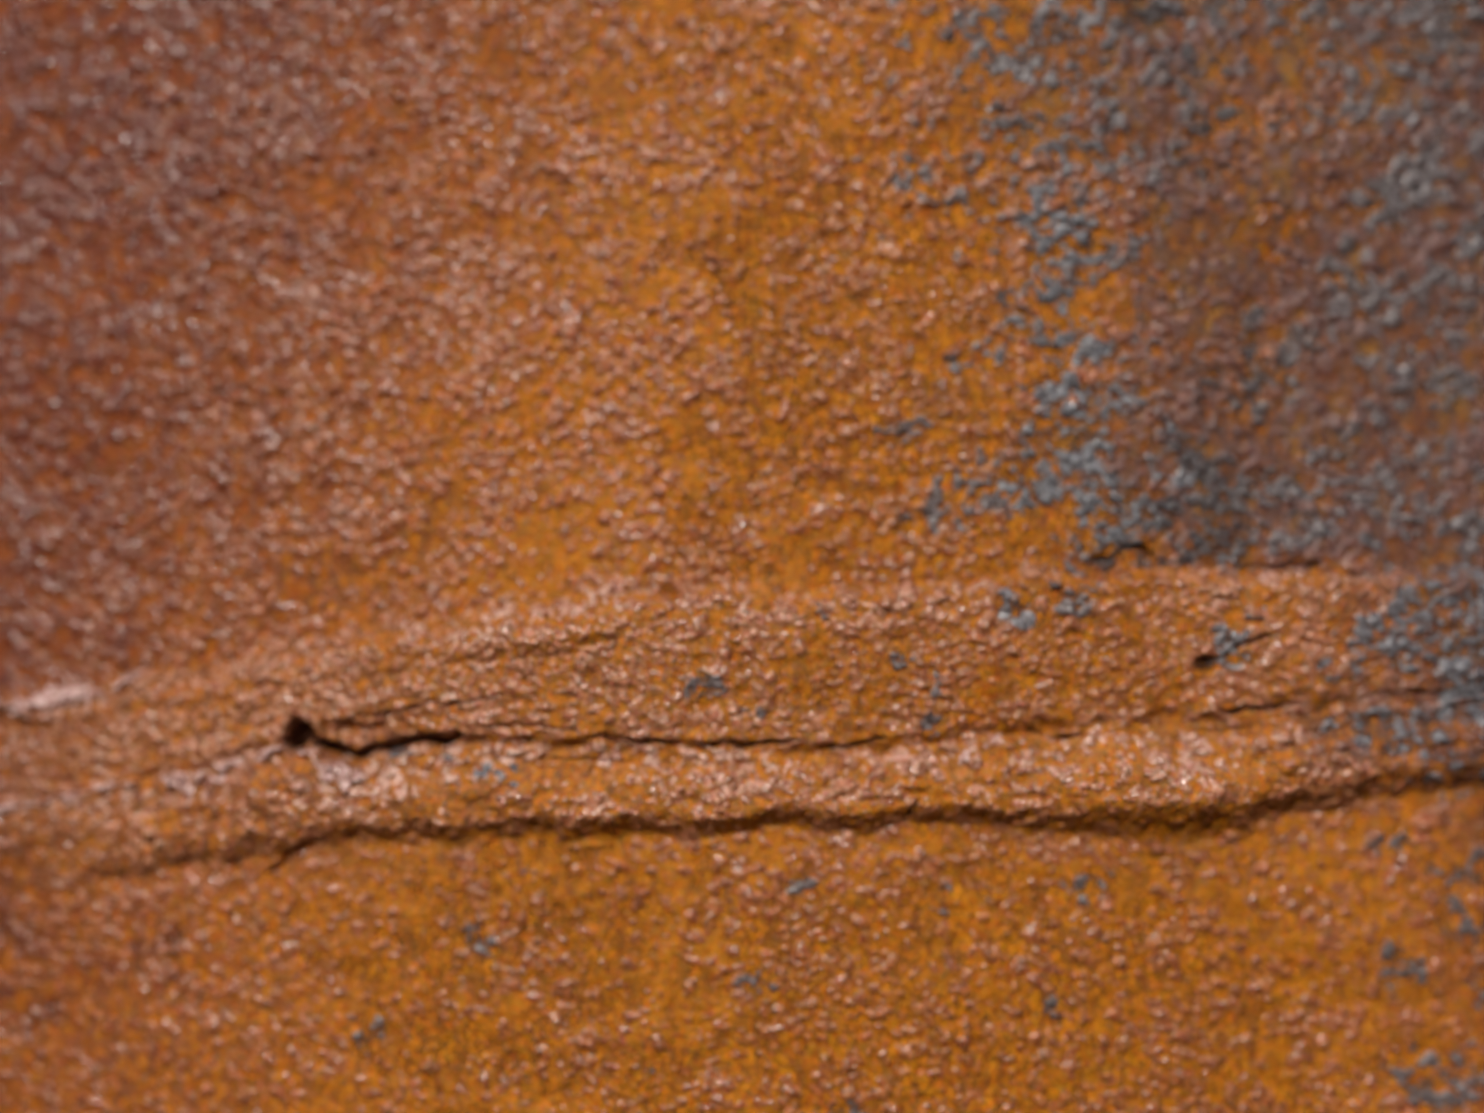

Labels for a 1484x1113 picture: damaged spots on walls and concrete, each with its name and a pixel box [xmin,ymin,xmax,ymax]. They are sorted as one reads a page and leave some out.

corrosion [619,0,1251,765]
corrosion [0,659,152,716]
crack [314,692,889,759]
corrosion [160,744,363,799]
corrosion [292,723,1443,1113]